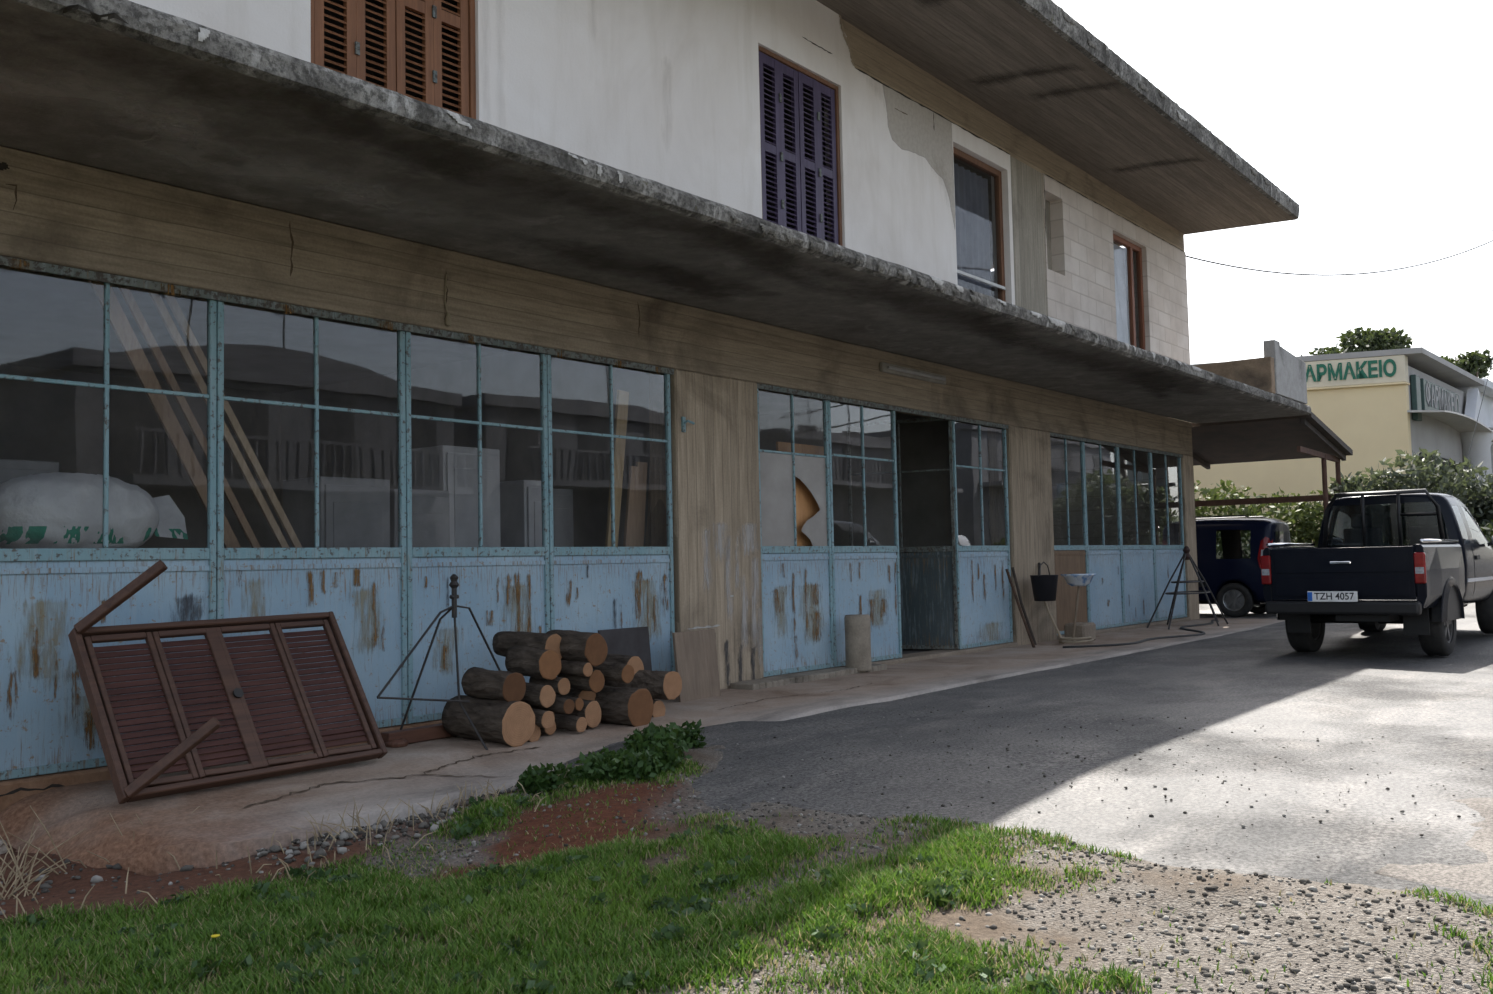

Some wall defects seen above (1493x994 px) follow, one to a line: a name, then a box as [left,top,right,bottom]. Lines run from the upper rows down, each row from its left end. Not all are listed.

flaking render [883,83,955,228]
rust [306,569,336,607]
rust [354,568,385,650]
rust [486,572,542,633]
rust [621,571,668,634]
rust [774,564,823,658]
rust [850,562,897,625]
rust [7,602,95,750]
crack [244,747,539,808]